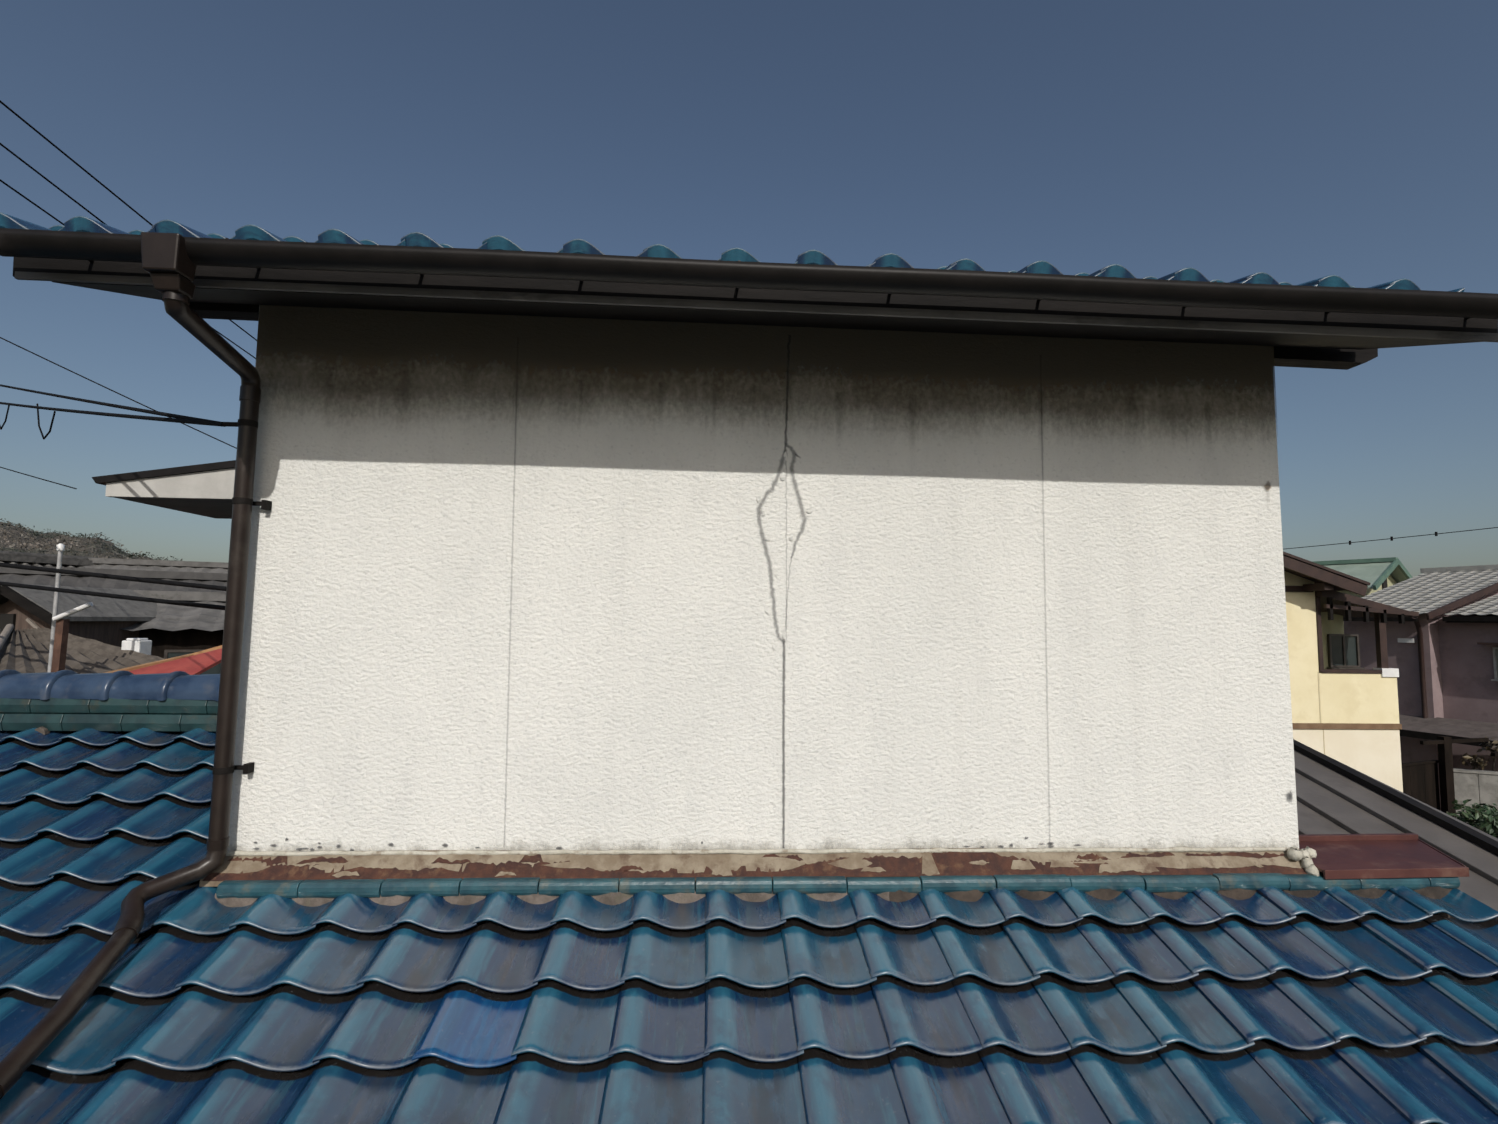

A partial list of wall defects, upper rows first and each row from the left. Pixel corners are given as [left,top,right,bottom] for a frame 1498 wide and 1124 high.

damp [256,305,1276,421]
crack [756,335,812,848]
peeling [712,862,733,876]
peeling [922,852,940,876]
peeling [964,837,1080,870]
peeling [1099,863,1159,873]
peeling [1187,861,1263,869]